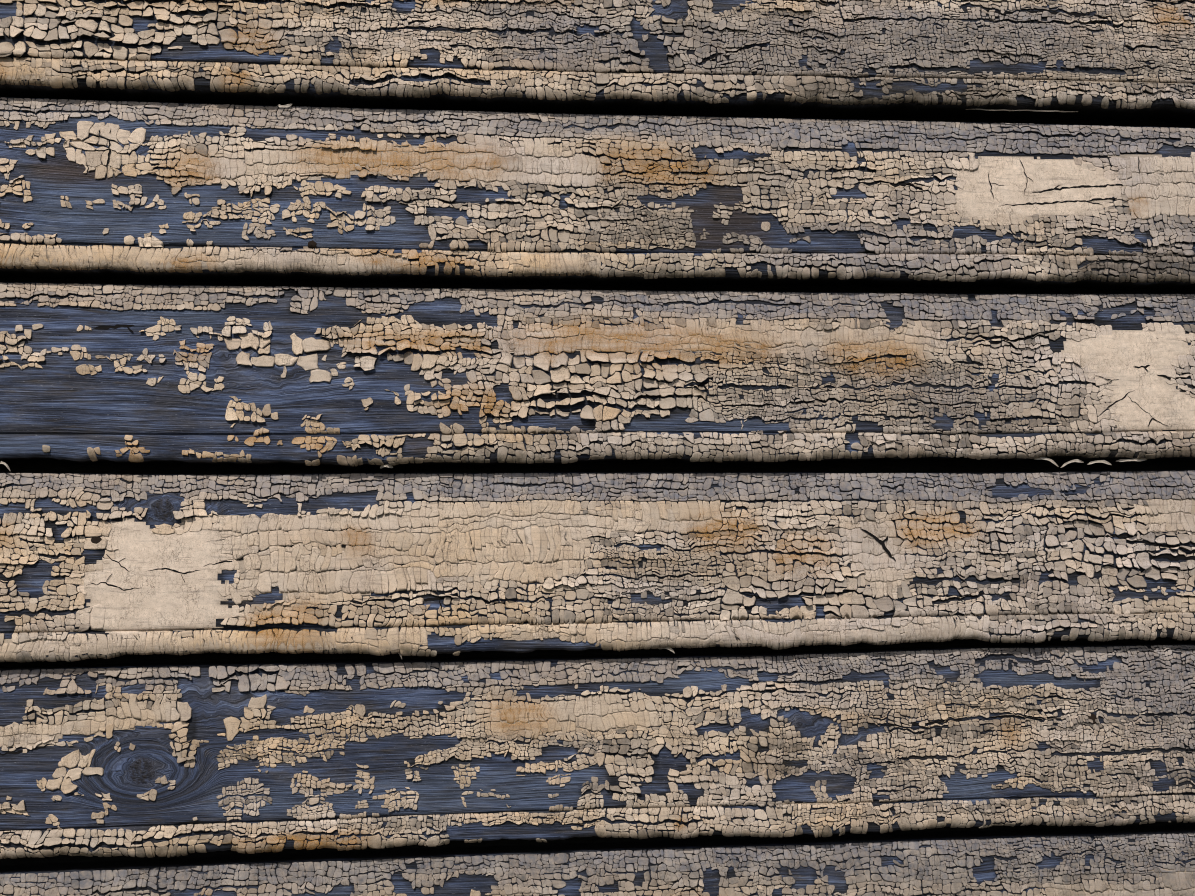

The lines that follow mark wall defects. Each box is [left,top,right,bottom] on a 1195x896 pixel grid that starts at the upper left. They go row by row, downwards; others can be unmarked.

peeling [0,112,524,259]
peeling [608,134,867,268]
crack [988,156,1169,206]
peeling [0,286,595,467]
crack [1096,365,1193,427]
peeling [0,485,423,646]
crack [86,520,530,591]
crack [860,528,896,561]
crack [982,511,1195,561]
crack [329,596,544,611]
peeling [0,586,903,845]
peeling [936,750,1112,820]